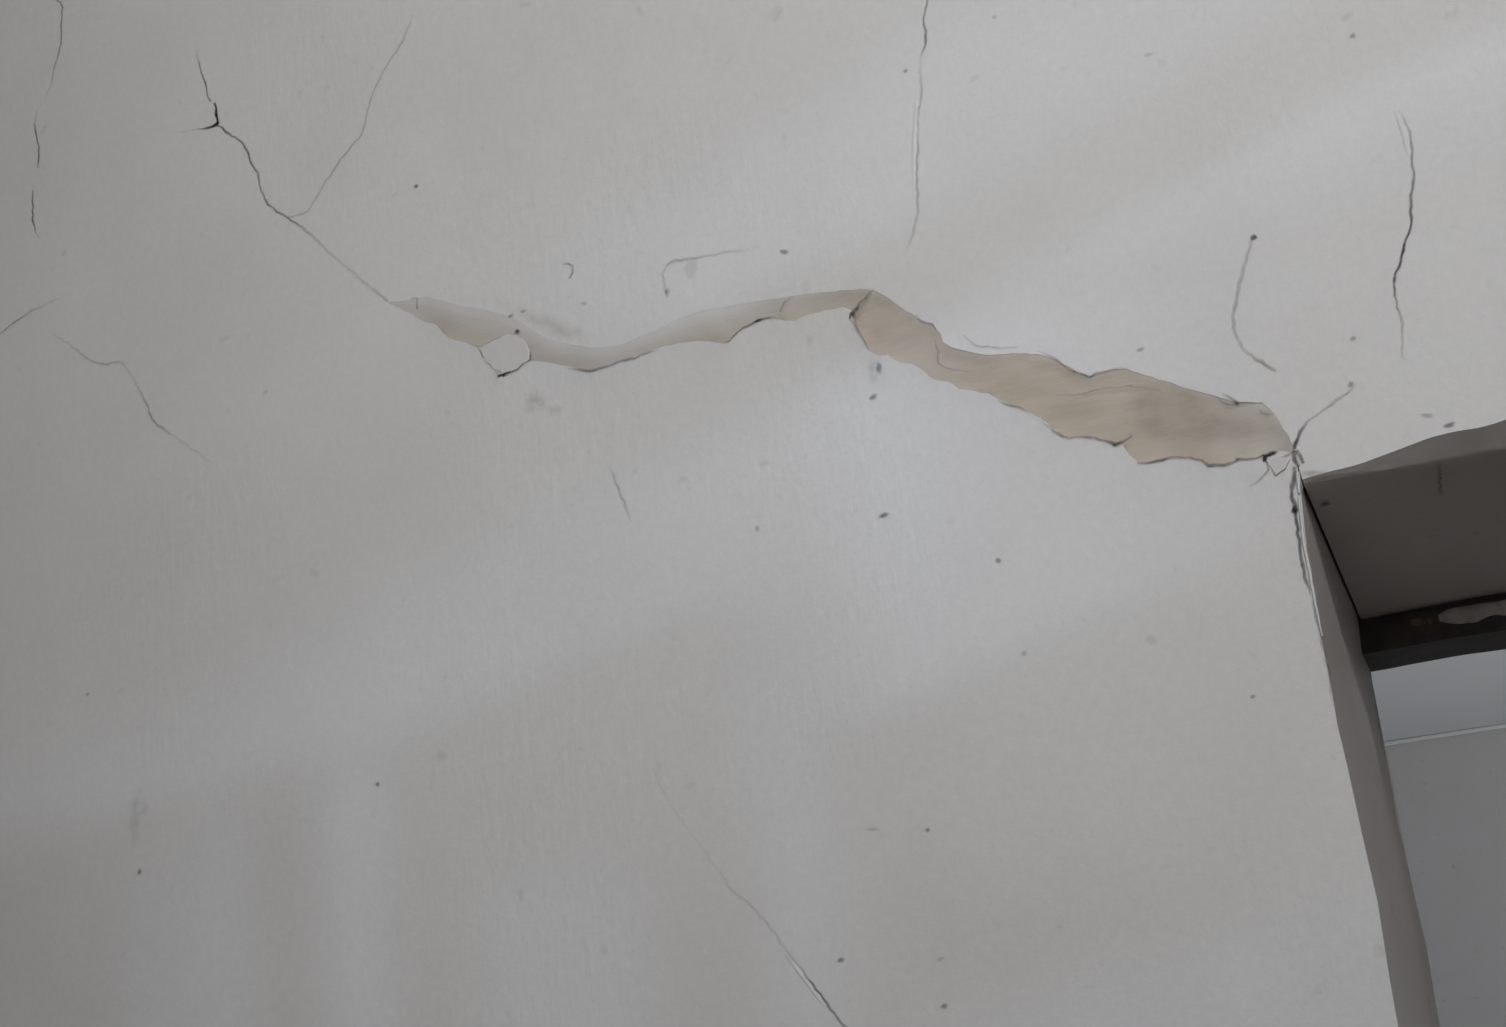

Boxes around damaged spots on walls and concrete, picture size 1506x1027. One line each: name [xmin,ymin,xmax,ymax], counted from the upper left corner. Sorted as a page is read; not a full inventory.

crack [205,81,252,165]
crack [1393,208,1413,290]
flaking render [388,289,1324,637]